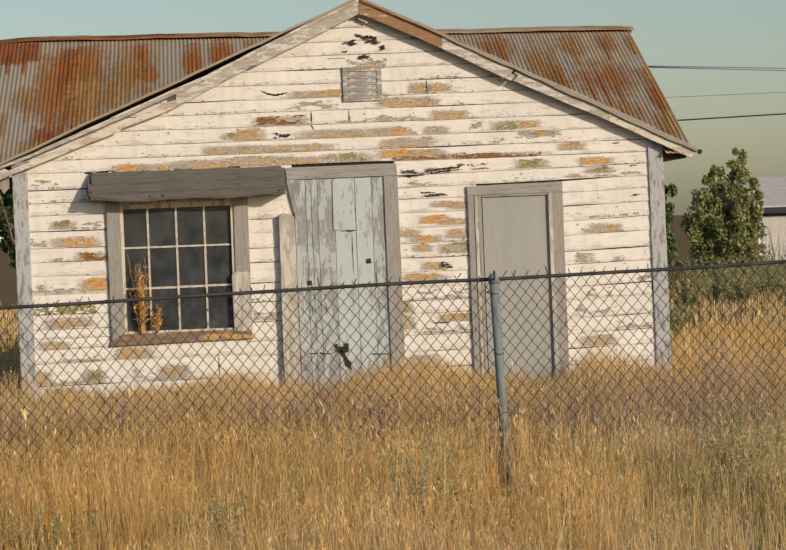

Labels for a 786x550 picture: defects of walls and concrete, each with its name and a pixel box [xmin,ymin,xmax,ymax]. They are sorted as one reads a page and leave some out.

corrosion [184,39,232,74]
peeling [342,34,387,68]
corrosion [478,34,515,62]
corrosion [527,41,568,88]
corrosion [0,43,157,153]
corrosion [562,34,680,138]
peeling [112,82,640,299]
peeling [30,220,108,261]
peeling [32,277,109,294]
peeling [200,332,253,340]
peeling [424,312,473,333]
peeling [582,320,651,346]